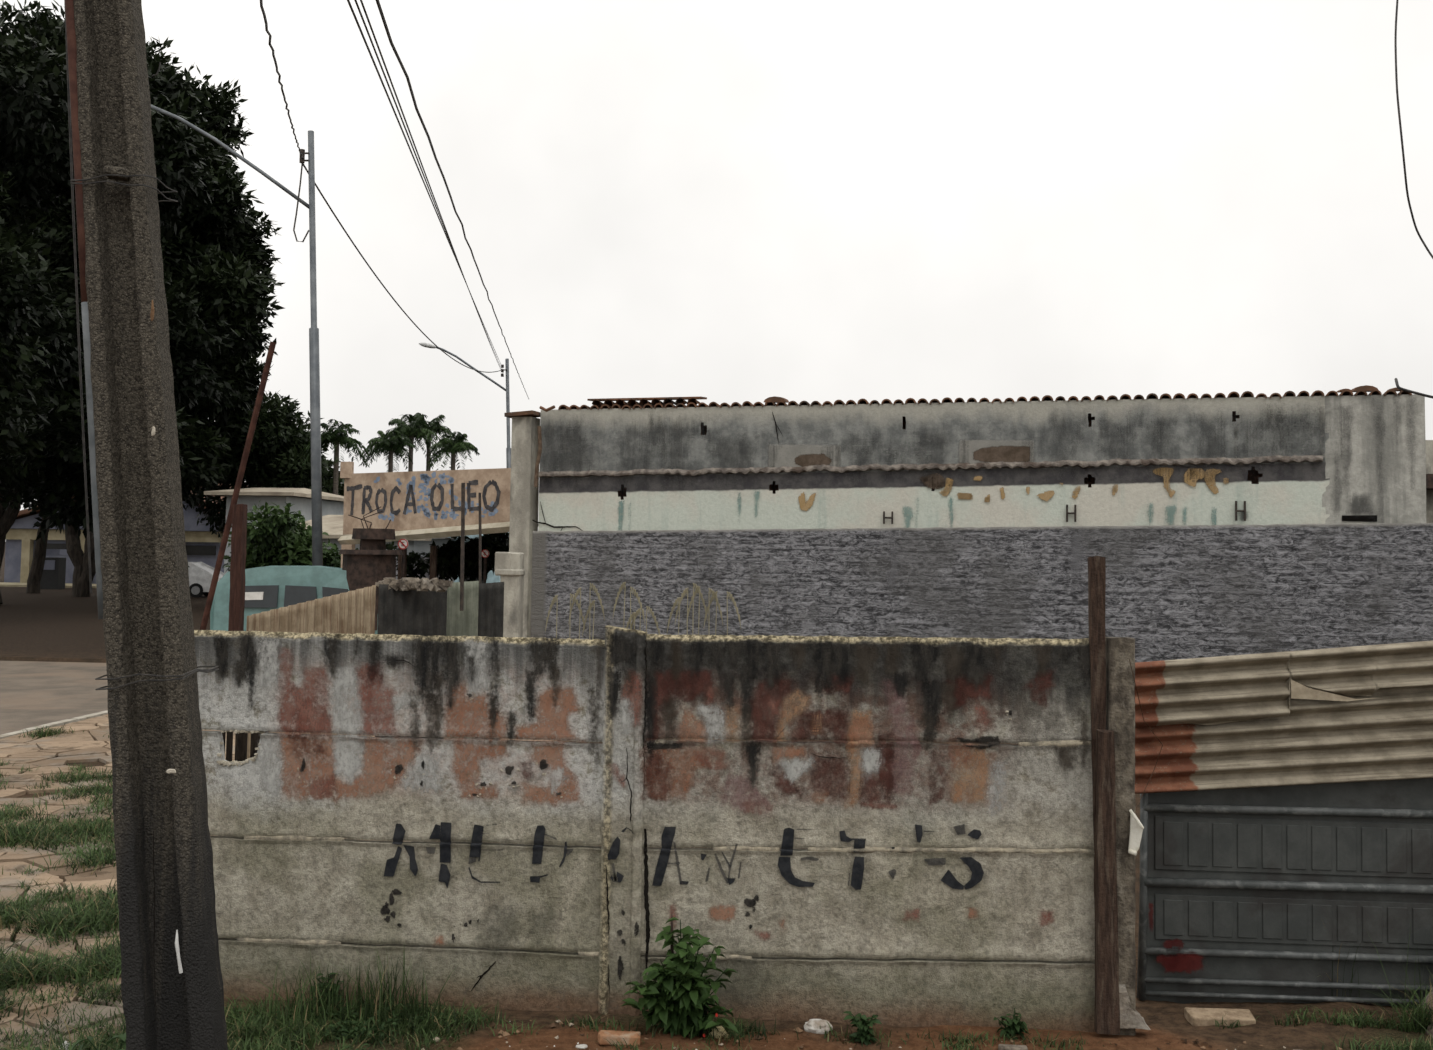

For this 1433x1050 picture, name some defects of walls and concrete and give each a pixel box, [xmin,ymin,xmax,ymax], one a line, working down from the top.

damp [214,632,260,707]
peeling [217,637,579,805]
damp [323,635,560,748]
peeling [621,670,725,800]
damp [588,632,1003,787]
peeling [772,675,920,808]
peeling [946,674,1006,810]
damp [1034,642,1089,684]
damp [1055,710,1088,770]